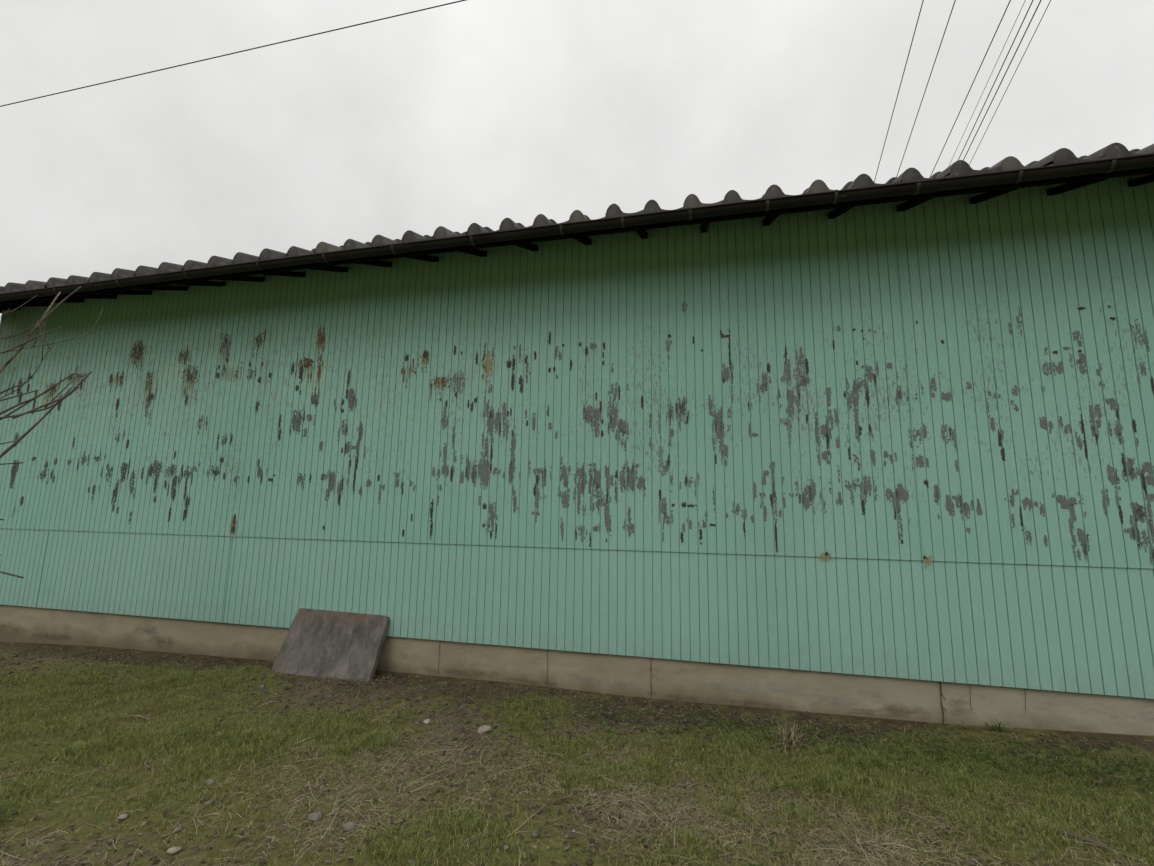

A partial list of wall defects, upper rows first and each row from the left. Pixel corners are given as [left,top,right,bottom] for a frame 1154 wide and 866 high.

peeling [9,397,276,525]
peeling [278,363,320,441]
rust [295,323,325,400]
peeling [296,370,416,506]
rust [401,346,452,402]
peeling [429,330,910,552]
peeling [896,377,952,412]
peeling [908,424,982,533]
peeling [987,385,1019,461]
peeling [1039,319,1154,565]
peeling [1005,489,1090,561]